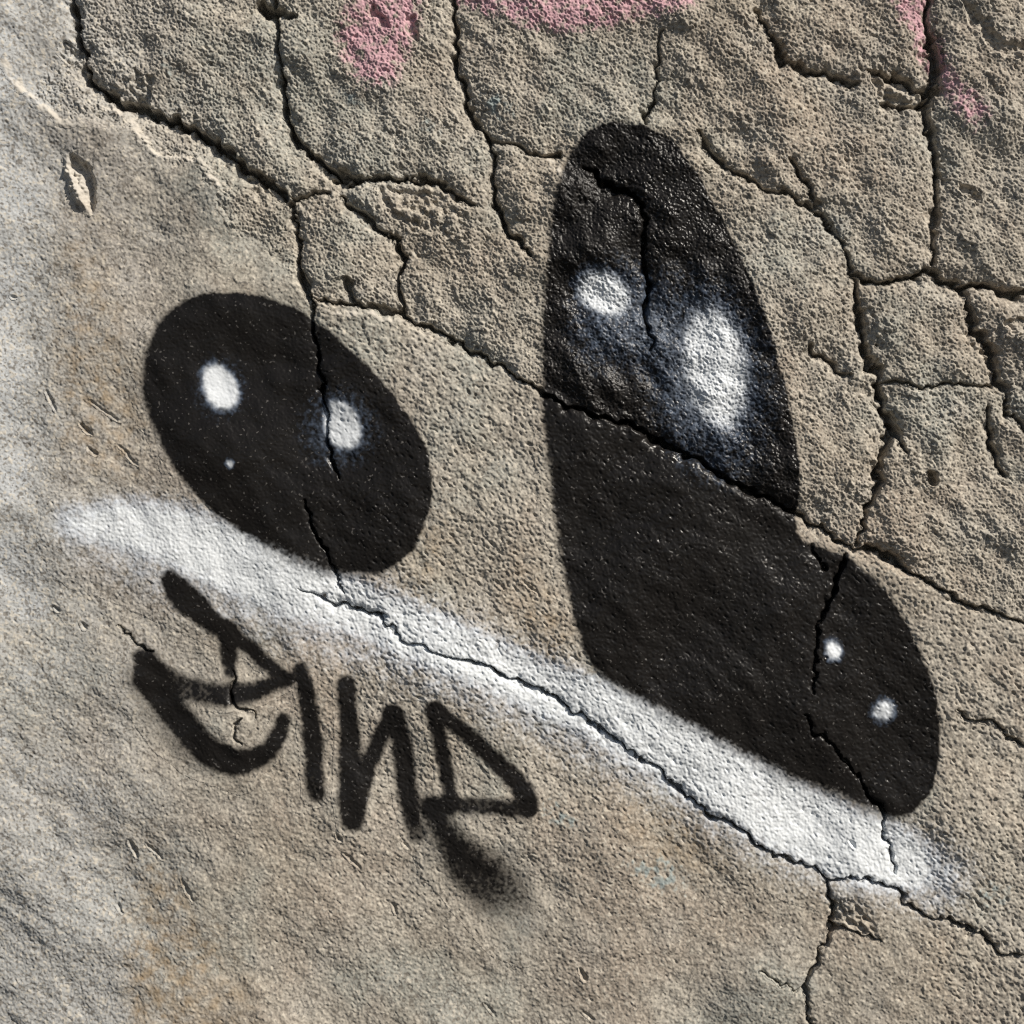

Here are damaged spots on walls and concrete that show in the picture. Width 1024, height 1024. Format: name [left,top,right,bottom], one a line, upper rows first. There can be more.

crack [69,0,1024,695]
crack [229,670,257,746]
crack [296,499,1024,1024]